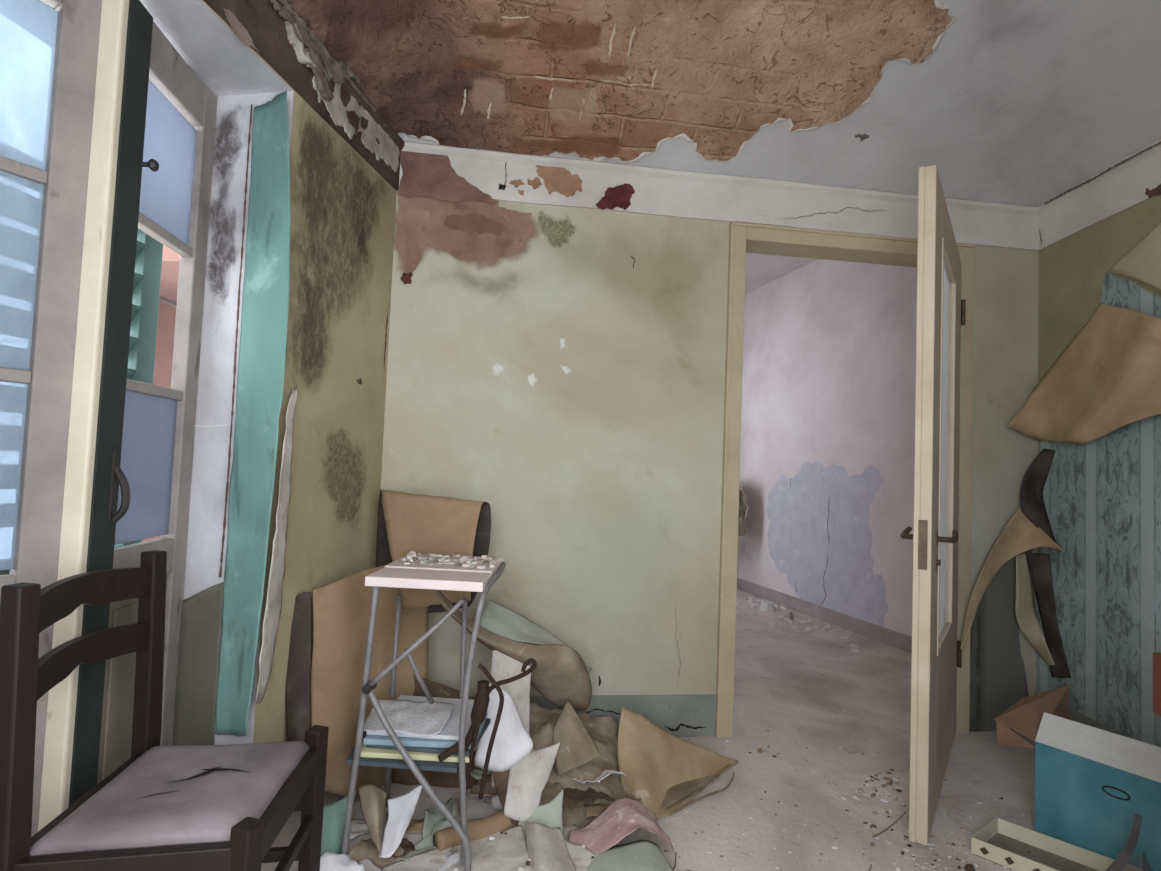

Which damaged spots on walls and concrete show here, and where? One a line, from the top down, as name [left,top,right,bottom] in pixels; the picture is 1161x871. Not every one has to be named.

peeling [223,7,259,53]
mould [209,112,239,298]
mould [293,123,377,380]
damp [539,216,573,246]
flaking render [271,0,956,284]
crack [779,207,885,220]
crack [1039,141,1161,243]
flaking render [1145,184,1161,198]
peeling [766,460,888,627]